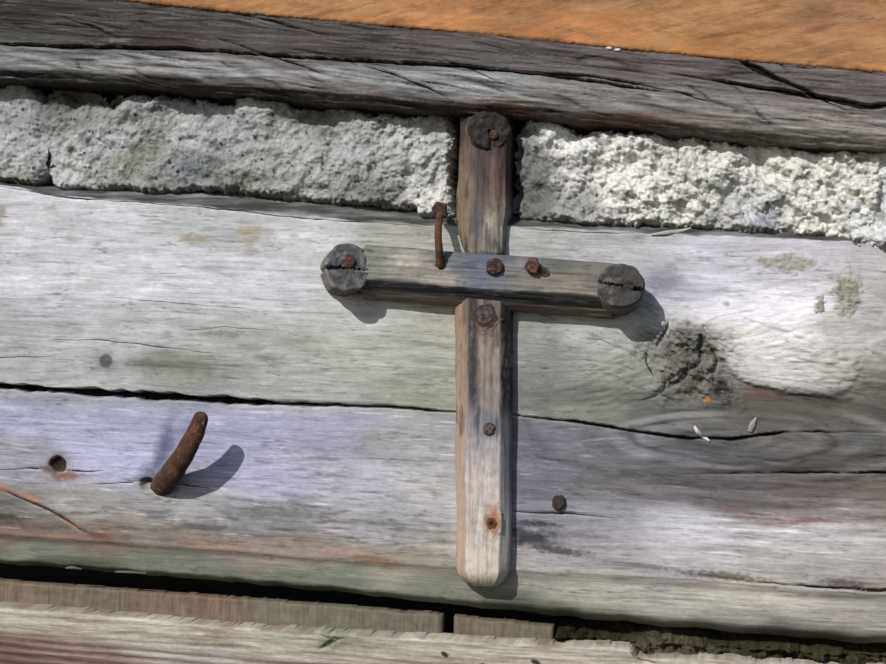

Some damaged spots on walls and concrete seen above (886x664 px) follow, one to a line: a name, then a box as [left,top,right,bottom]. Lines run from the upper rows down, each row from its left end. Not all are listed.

crack [0,14,886,113]
crack [635,321,718,402]
crack [0,383,449,412]
crack [516,415,784,440]
crack [706,468,886,476]
rust [480,501,502,543]